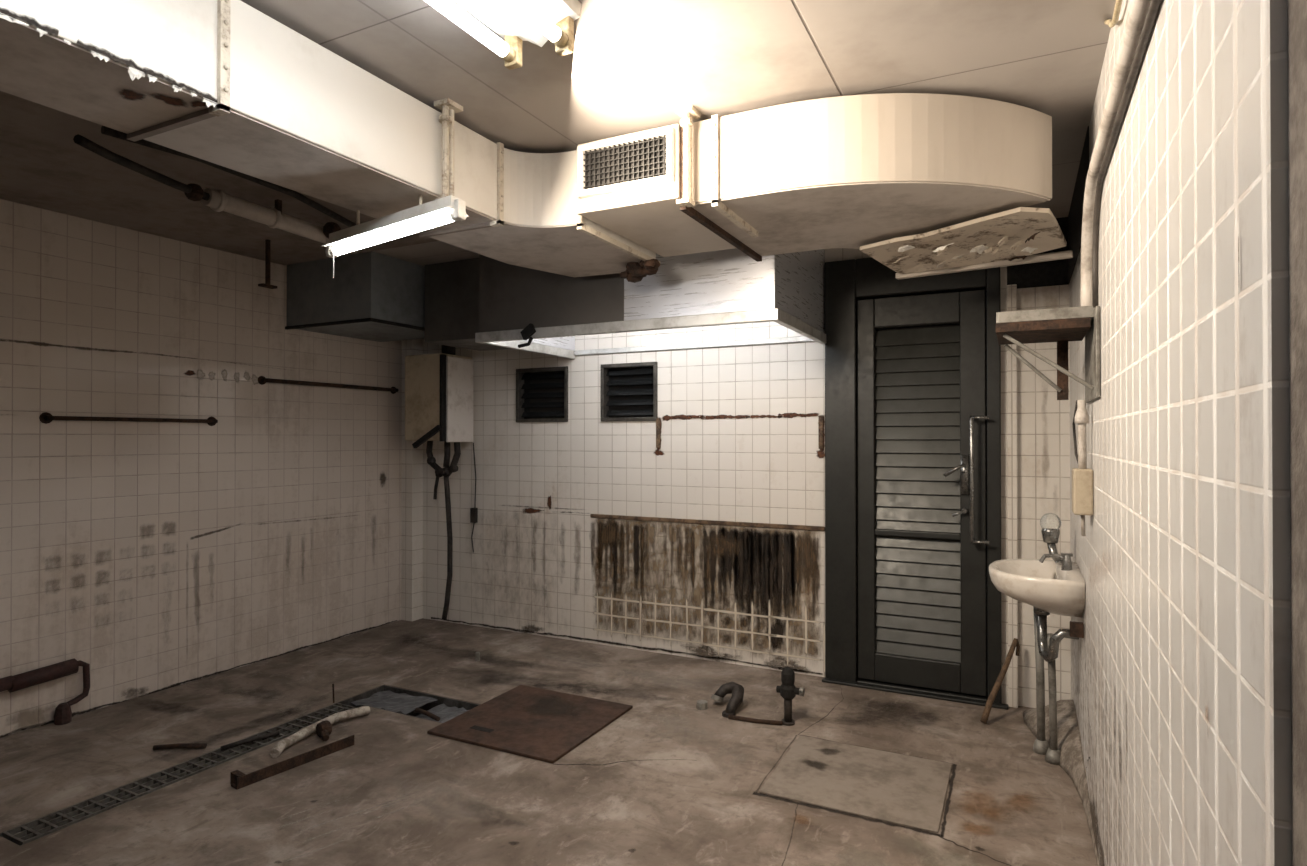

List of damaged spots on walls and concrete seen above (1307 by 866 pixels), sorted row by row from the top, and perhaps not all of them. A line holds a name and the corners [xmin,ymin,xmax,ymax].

peeling [0,8,217,107]
peeling [860,207,1073,280]
water stain [591,522,648,594]
water stain [671,527,820,622]